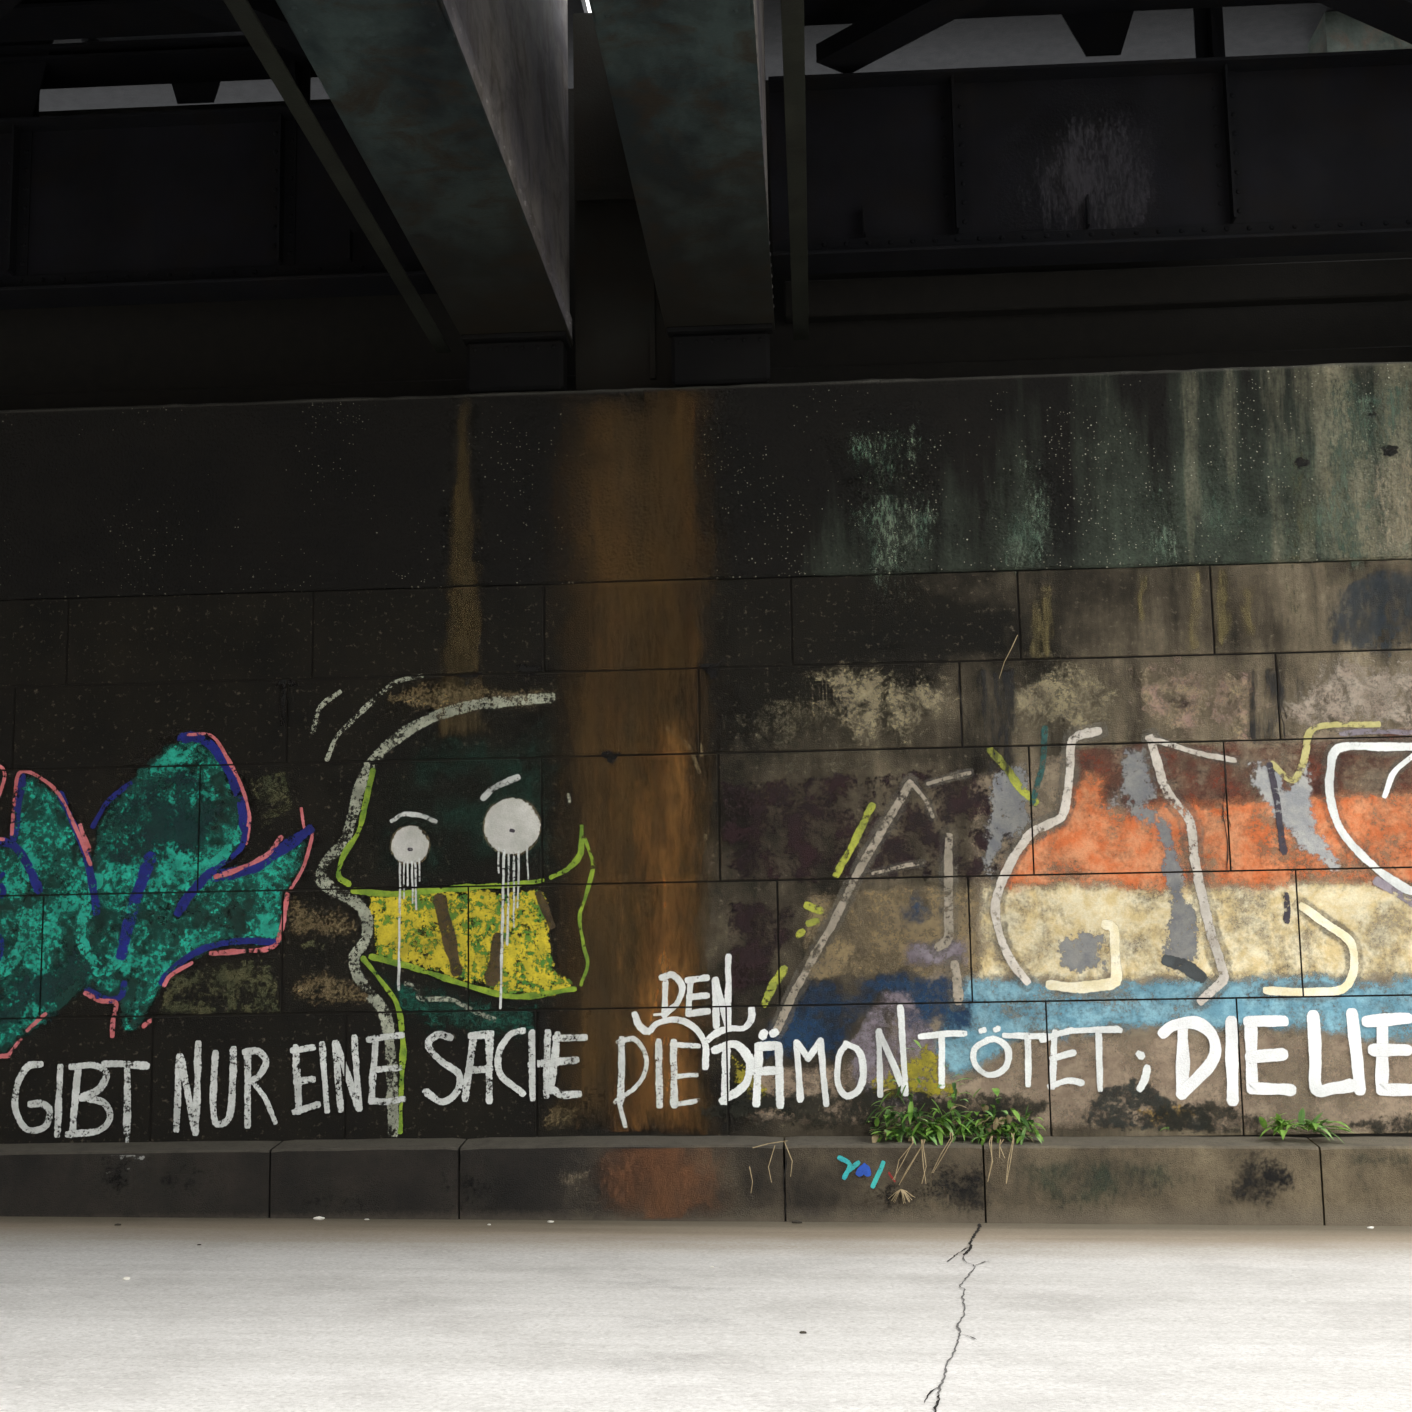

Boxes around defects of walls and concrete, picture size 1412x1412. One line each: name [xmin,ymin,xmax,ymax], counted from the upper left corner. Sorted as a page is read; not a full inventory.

corrosion [438,414,483,736]
damp [851,421,936,584]
damp [1003,459,1052,573]
damp [1288,380,1412,656]
corrosion [564,391,709,1127]
crack [924,1223,986,1412]